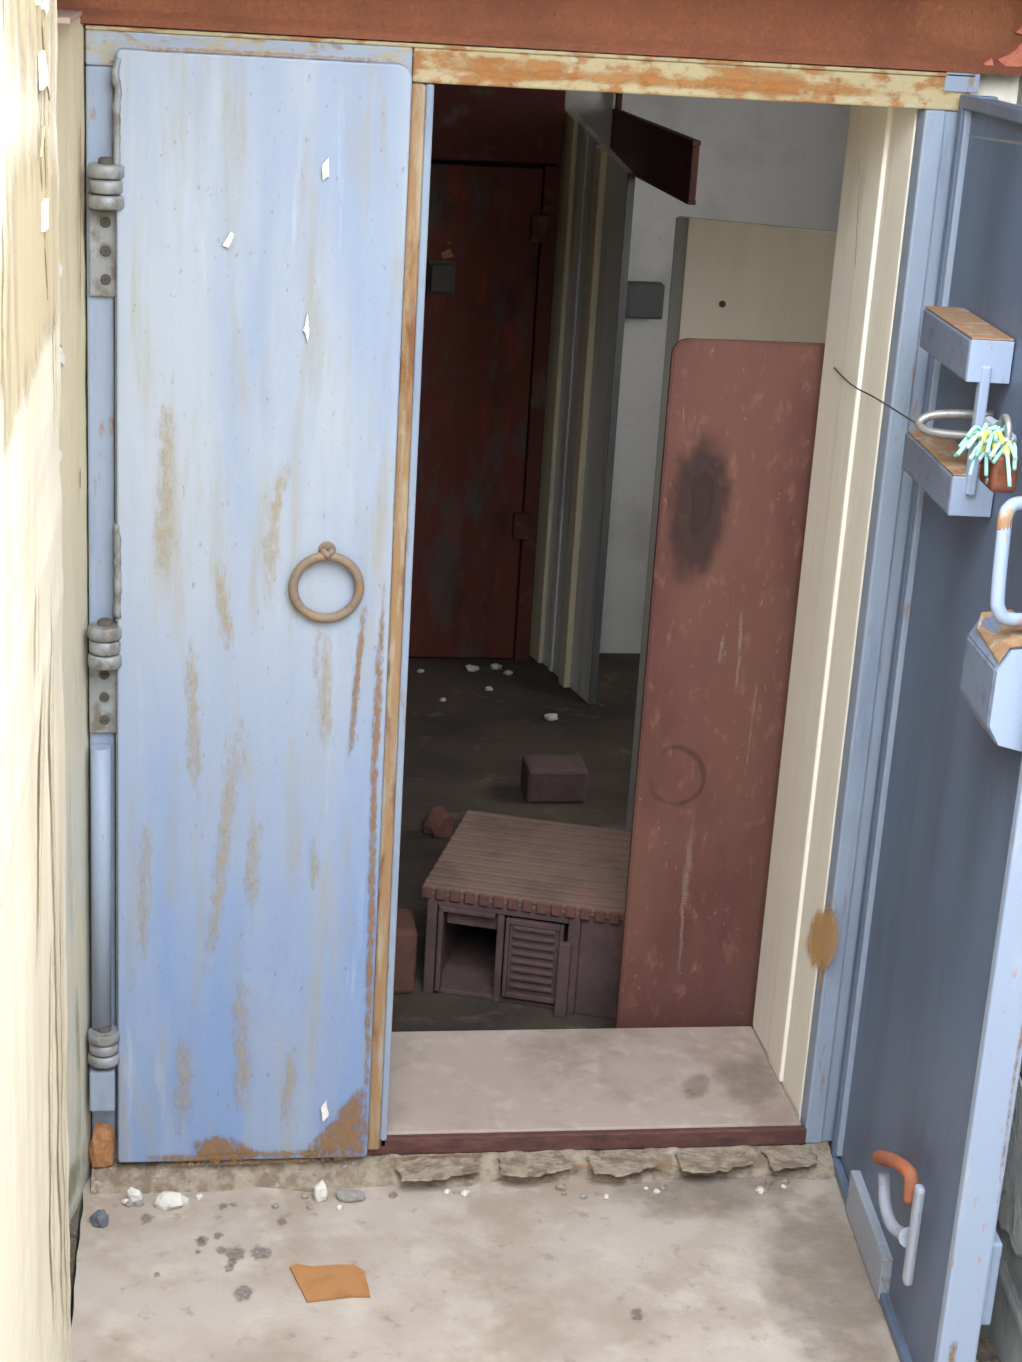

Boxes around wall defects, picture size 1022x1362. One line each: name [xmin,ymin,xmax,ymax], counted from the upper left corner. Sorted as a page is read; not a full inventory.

corrosion [148,47,372,62]
peeling [983,26,1022,67]
corrosion [394,266,408,521]
corrosion [149,613,384,1166]
spalling [997,1074,1022,1257]